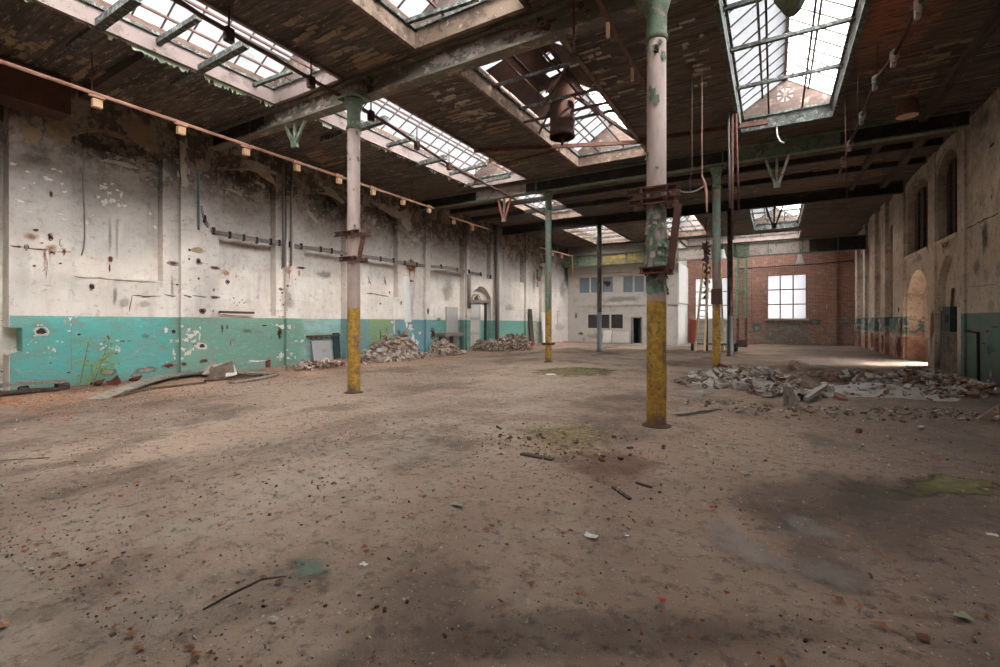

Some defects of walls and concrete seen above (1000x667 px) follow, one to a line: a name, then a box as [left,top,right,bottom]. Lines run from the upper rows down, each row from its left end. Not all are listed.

peeling [97,183,127,209]
spalling [26,324,63,364]
peeling [132,325,215,377]